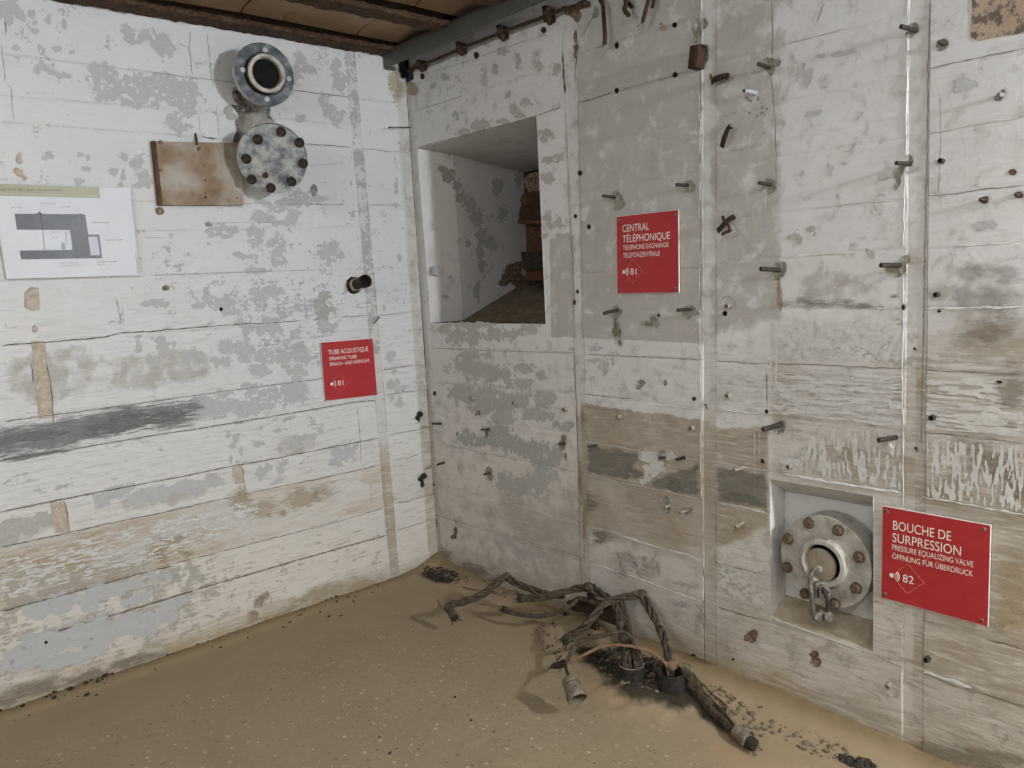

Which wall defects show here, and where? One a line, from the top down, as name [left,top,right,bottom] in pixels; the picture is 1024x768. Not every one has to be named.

peeling [0,0,209,137]
spalling [223,87,273,143]
spalling [399,60,414,82]
rust [406,0,587,95]
spalling [25,286,40,311]
peeling [135,184,329,420]
spalling [31,325,54,419]
peeling [92,431,289,509]
peeling [434,321,575,499]
peeling [792,426,871,483]
peeling [970,445,1024,512]
peeling [0,499,259,673]